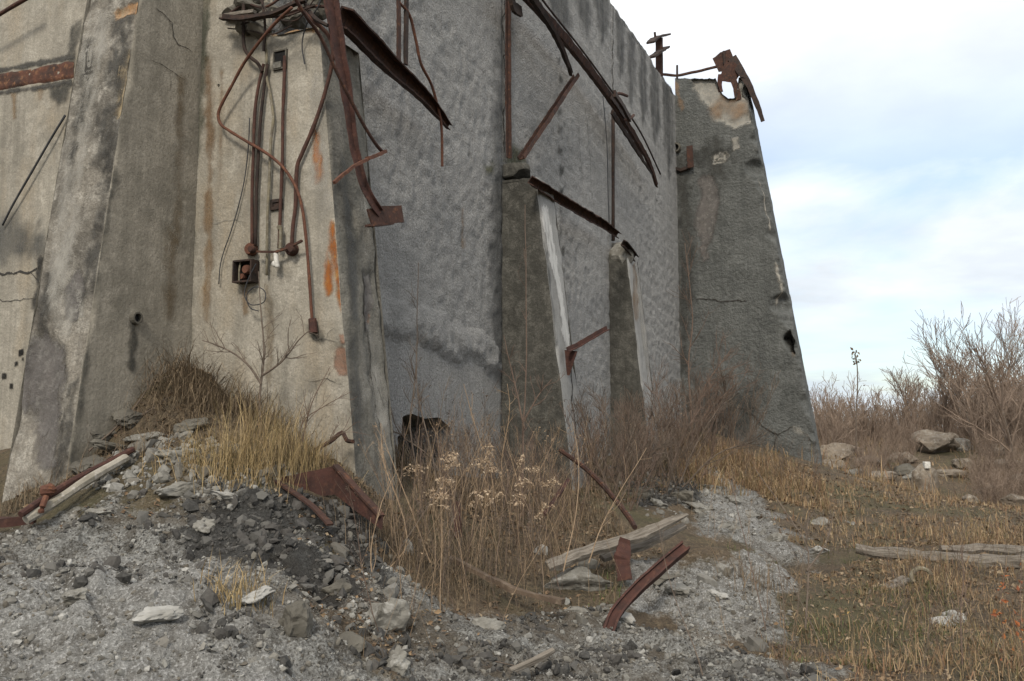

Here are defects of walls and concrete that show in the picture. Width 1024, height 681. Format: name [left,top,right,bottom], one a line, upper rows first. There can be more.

spalling [114,3,138,20]
rust [313,130,323,180]
spalling [692,79,751,262]
rust [324,222,341,308]
leakage [128,324,137,371]